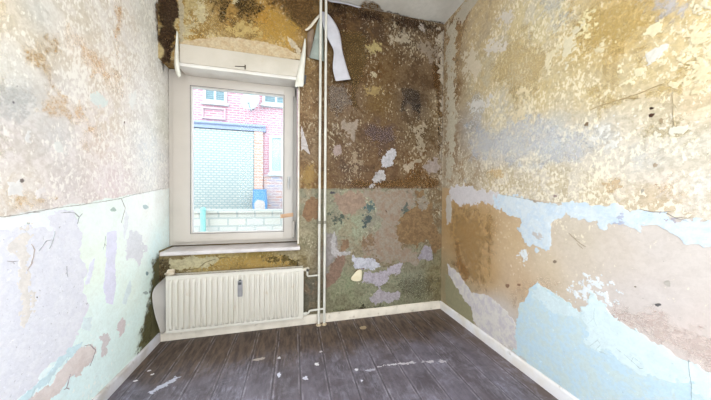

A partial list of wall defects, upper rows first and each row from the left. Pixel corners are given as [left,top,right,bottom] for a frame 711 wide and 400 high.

water stain [155,0,179,70]
peeling [539,8,599,79]
peeling [617,44,669,86]
peeling [642,19,663,36]
peeling [649,0,711,142]
peeling [301,126,310,154]
flaking render [322,9,515,305]
flaking render [302,196,318,222]
peeling [0,209,126,400]
peeling [103,230,148,305]
water stain [137,255,171,354]
flaking render [447,264,517,349]